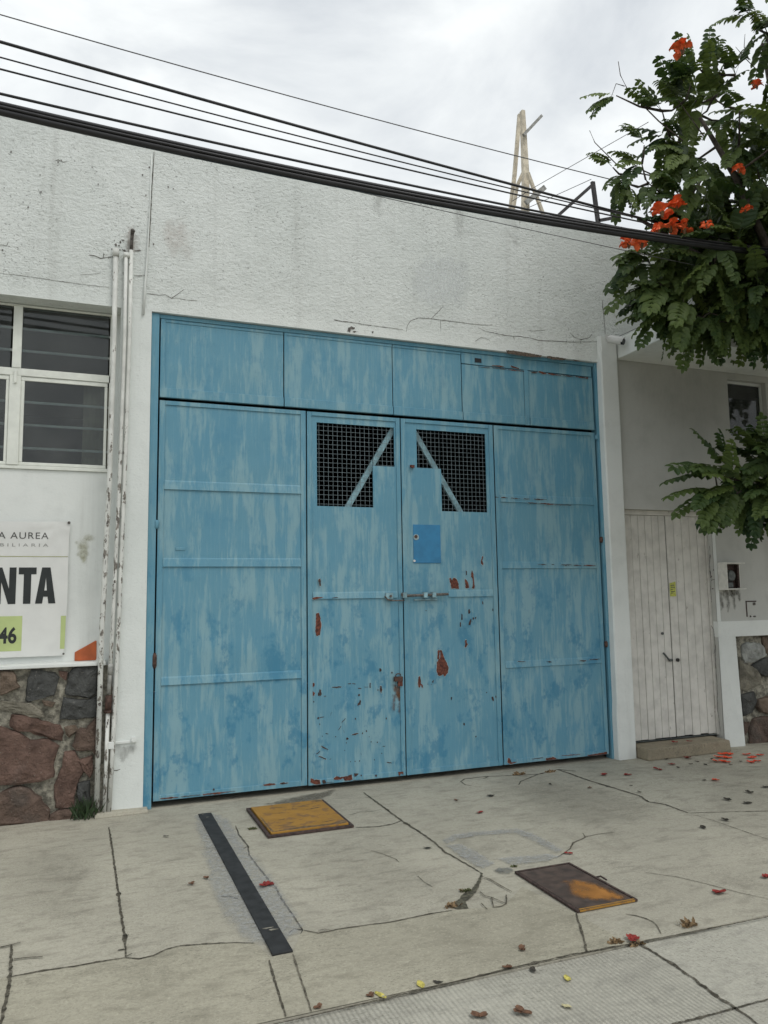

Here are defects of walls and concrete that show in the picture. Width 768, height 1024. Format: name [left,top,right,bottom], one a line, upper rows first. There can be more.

crack [336,300,605,344]
crack [354,792,512,909]
crack [460,769,752,834]
crack [0,827,251,1024]
crack [235,826,768,1024]